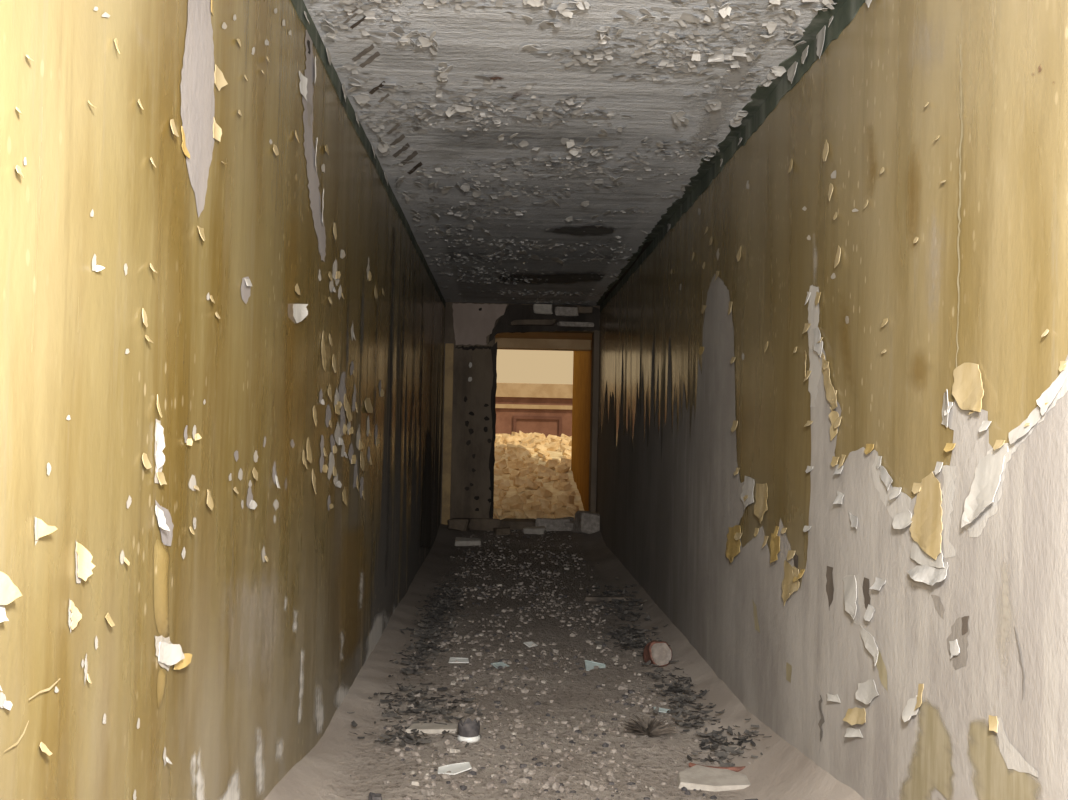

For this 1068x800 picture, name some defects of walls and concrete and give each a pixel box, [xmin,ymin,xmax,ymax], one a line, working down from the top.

peeling [170,0,236,241]
peeling [295,0,837,305]
peeling [184,425,202,446]
peeling [290,330,384,511]
peeling [0,571,22,623]
peeling [34,517,57,545]
peeling [68,599,82,634]
peeling [75,541,95,583]
peeling [154,500,192,709]
peeling [188,475,214,510]
peeling [229,437,266,509]
peeling [596,227,1068,800]